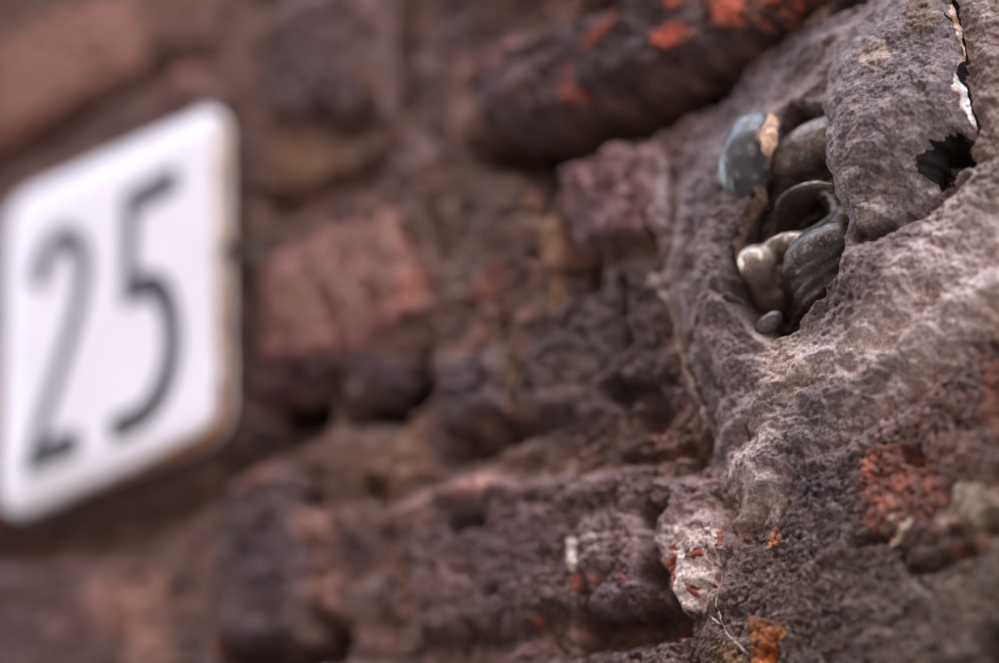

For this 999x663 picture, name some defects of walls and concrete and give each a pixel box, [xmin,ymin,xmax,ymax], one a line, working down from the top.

crack [938,0,981,137]
peeling [755,113,783,168]
peeling [729,179,768,268]